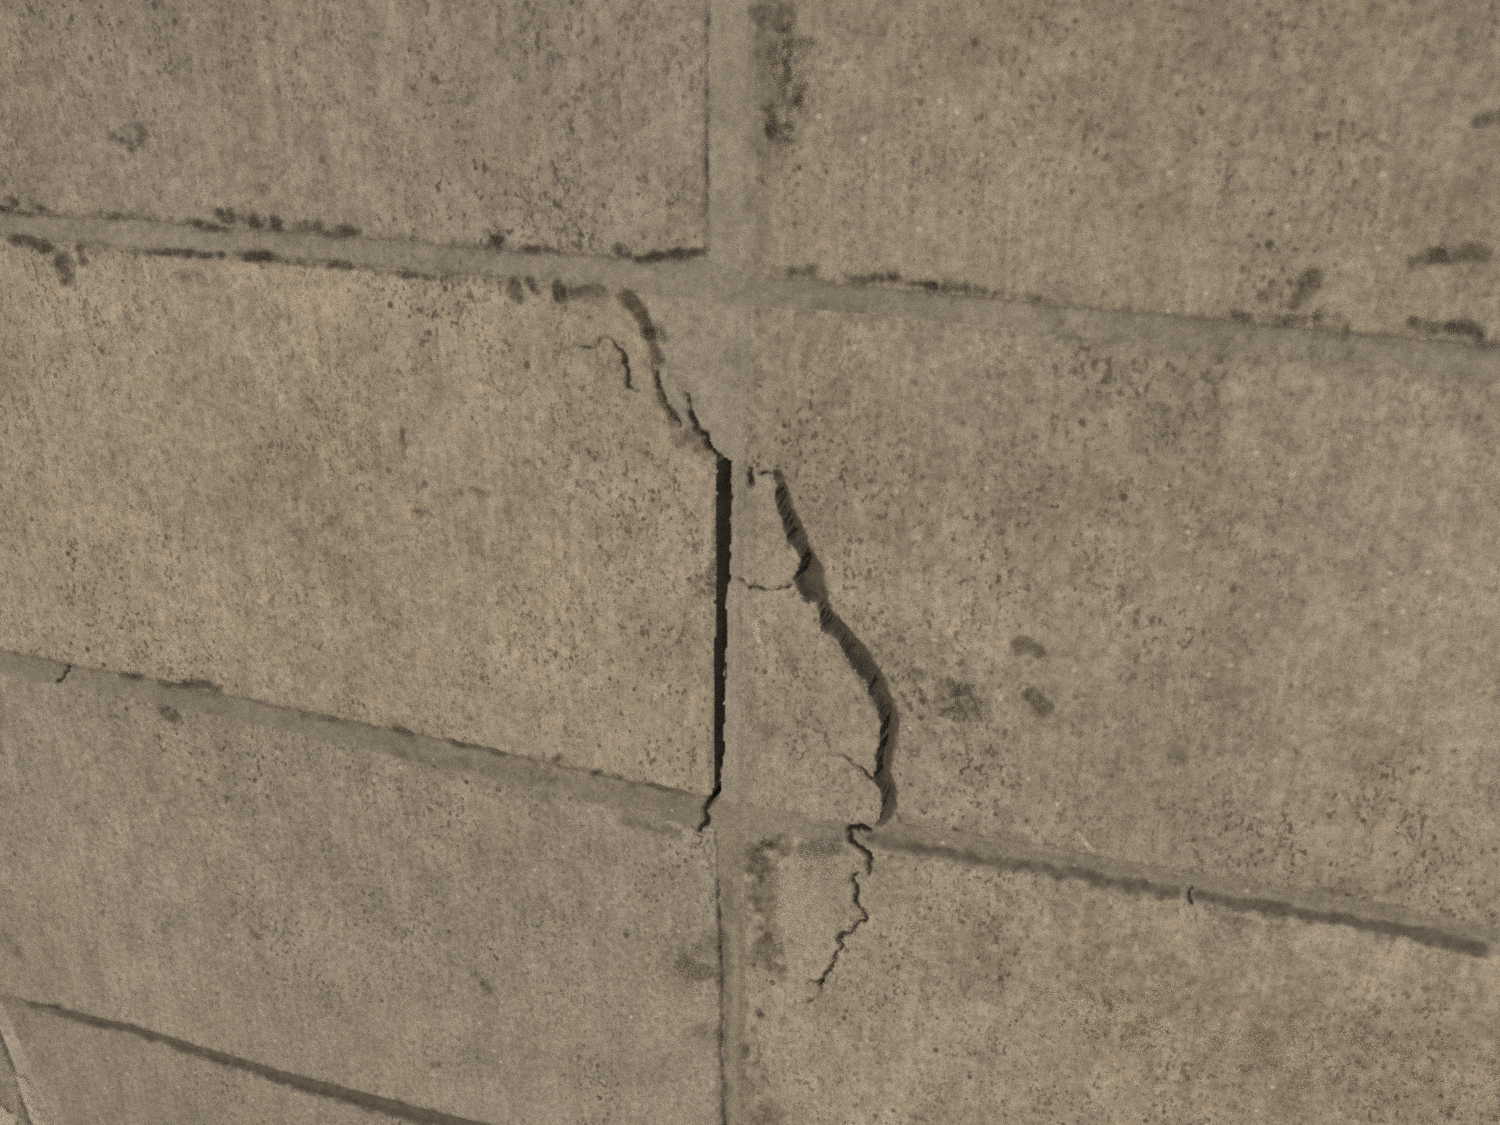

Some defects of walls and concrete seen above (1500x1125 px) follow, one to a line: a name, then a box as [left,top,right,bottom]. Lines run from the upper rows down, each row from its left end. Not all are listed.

crack [583,340,902,1002]